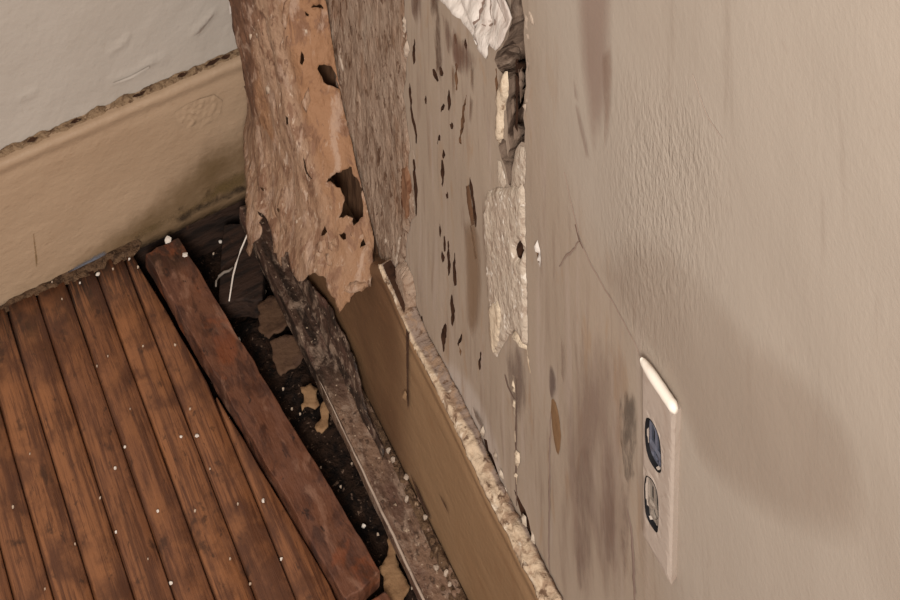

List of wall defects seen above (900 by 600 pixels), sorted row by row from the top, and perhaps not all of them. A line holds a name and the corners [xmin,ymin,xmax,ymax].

peeling [229,0,563,600]
crack [559,172,640,356]
damp [621,396,634,448]